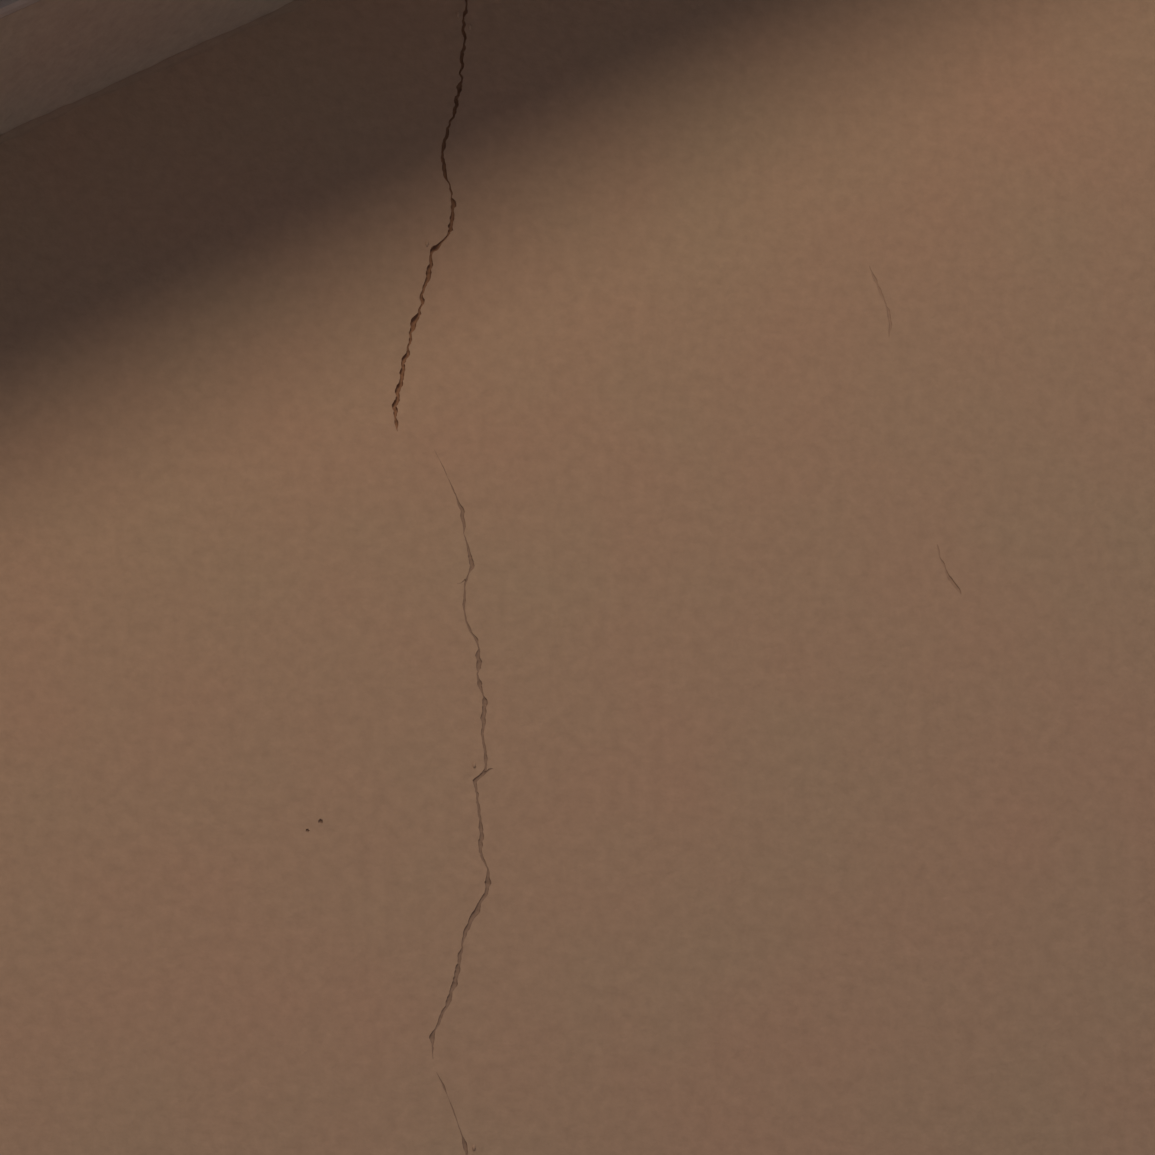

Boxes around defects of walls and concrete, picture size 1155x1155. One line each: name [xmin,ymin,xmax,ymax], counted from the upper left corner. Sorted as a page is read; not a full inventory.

crack [392,0,472,429]
crack [429,452,493,1155]